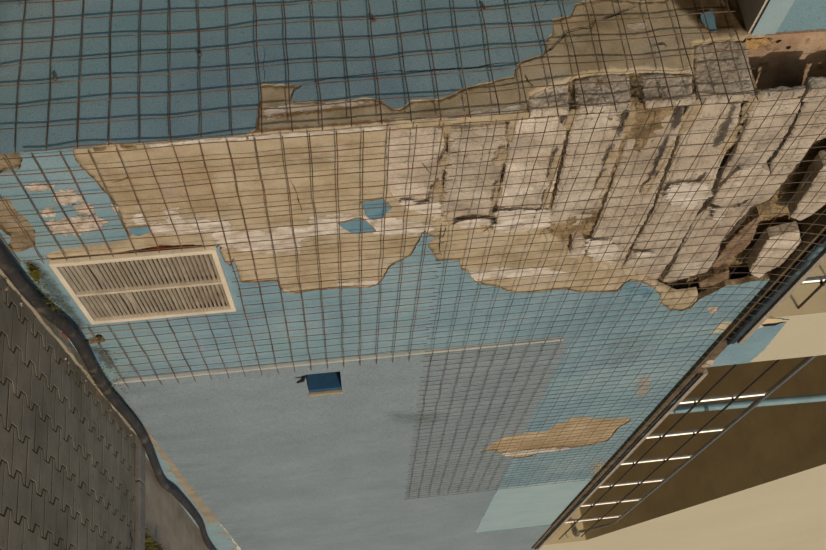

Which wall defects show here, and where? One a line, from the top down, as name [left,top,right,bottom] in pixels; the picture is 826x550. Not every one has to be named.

leakage [675,0,745,31]
crack [314,3,646,87]
corrosion [256,105,377,132]
flaking render [46,0,826,309]
flaking render [0,197,35,248]
peeling [25,181,110,236]
corrosion [117,245,206,254]
flaking render [486,417,630,457]